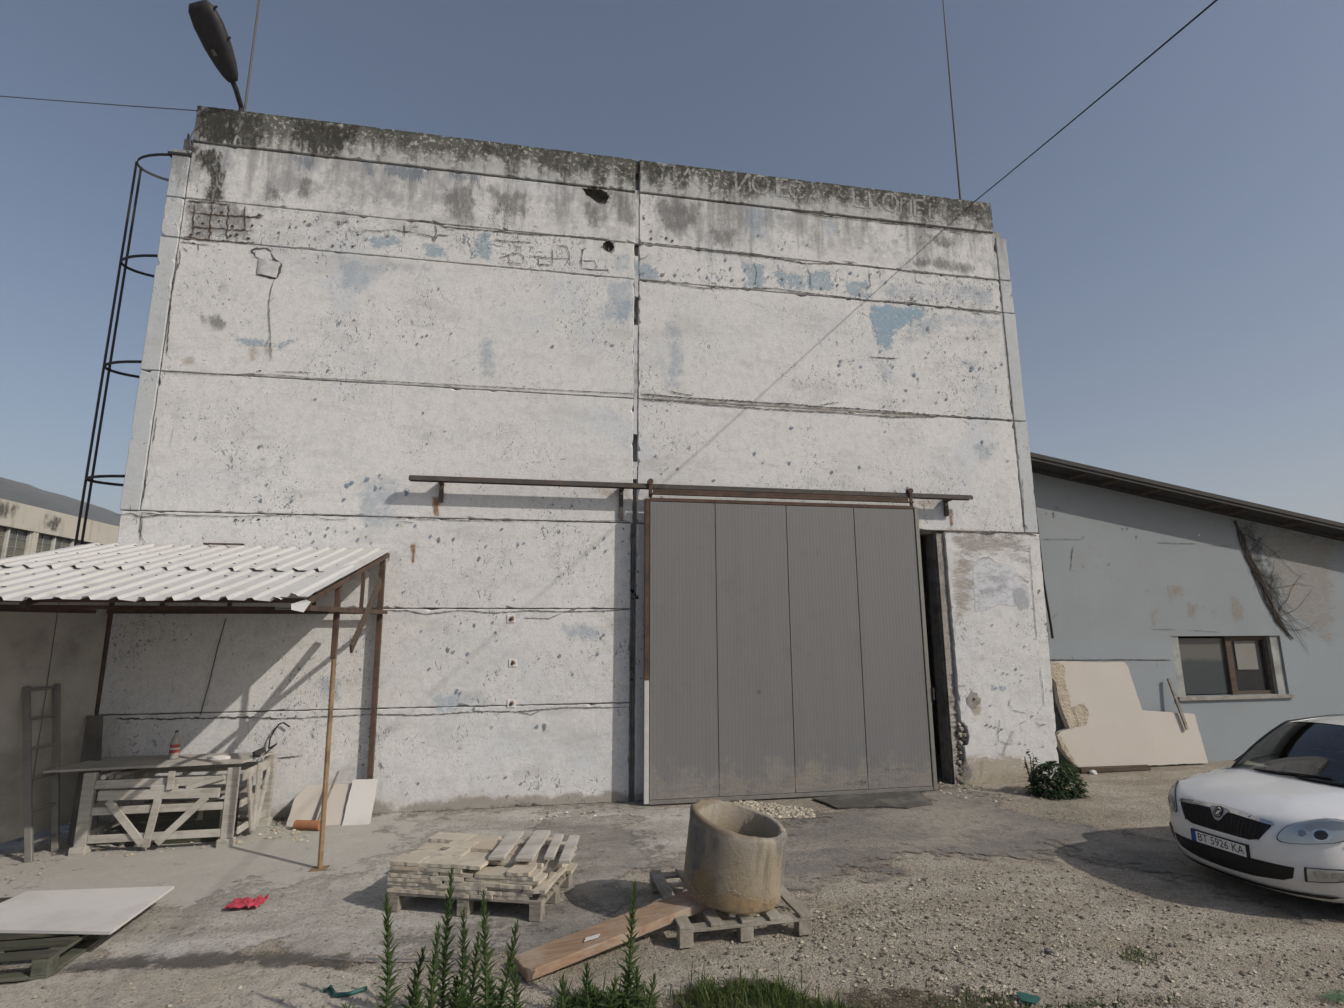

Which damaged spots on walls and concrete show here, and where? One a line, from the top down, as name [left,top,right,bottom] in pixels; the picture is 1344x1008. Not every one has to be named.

leakage [188,109,264,239]
leakage [290,117,359,193]
leakage [440,143,523,219]
leakage [540,149,696,228]
leakage [709,171,993,272]
peeling [969,546,1041,644]